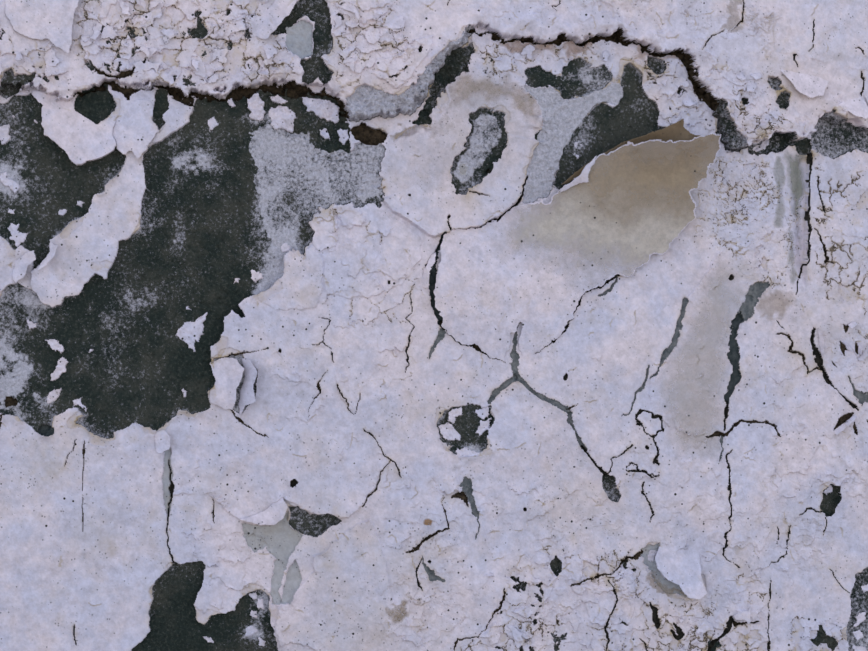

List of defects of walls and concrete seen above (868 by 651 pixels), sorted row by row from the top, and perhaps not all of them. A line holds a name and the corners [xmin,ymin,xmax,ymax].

crack [73,59,350,119]
peeling [0,0,868,517]
crack [405,176,689,523]
crack [689,152,868,568]
peeling [132,497,342,651]
crack [406,476,480,591]
crack [453,588,506,651]
crack [571,550,644,651]
peeling [456,531,772,651]
crack [639,602,685,651]
crack [707,507,827,651]
peeling [785,567,868,651]